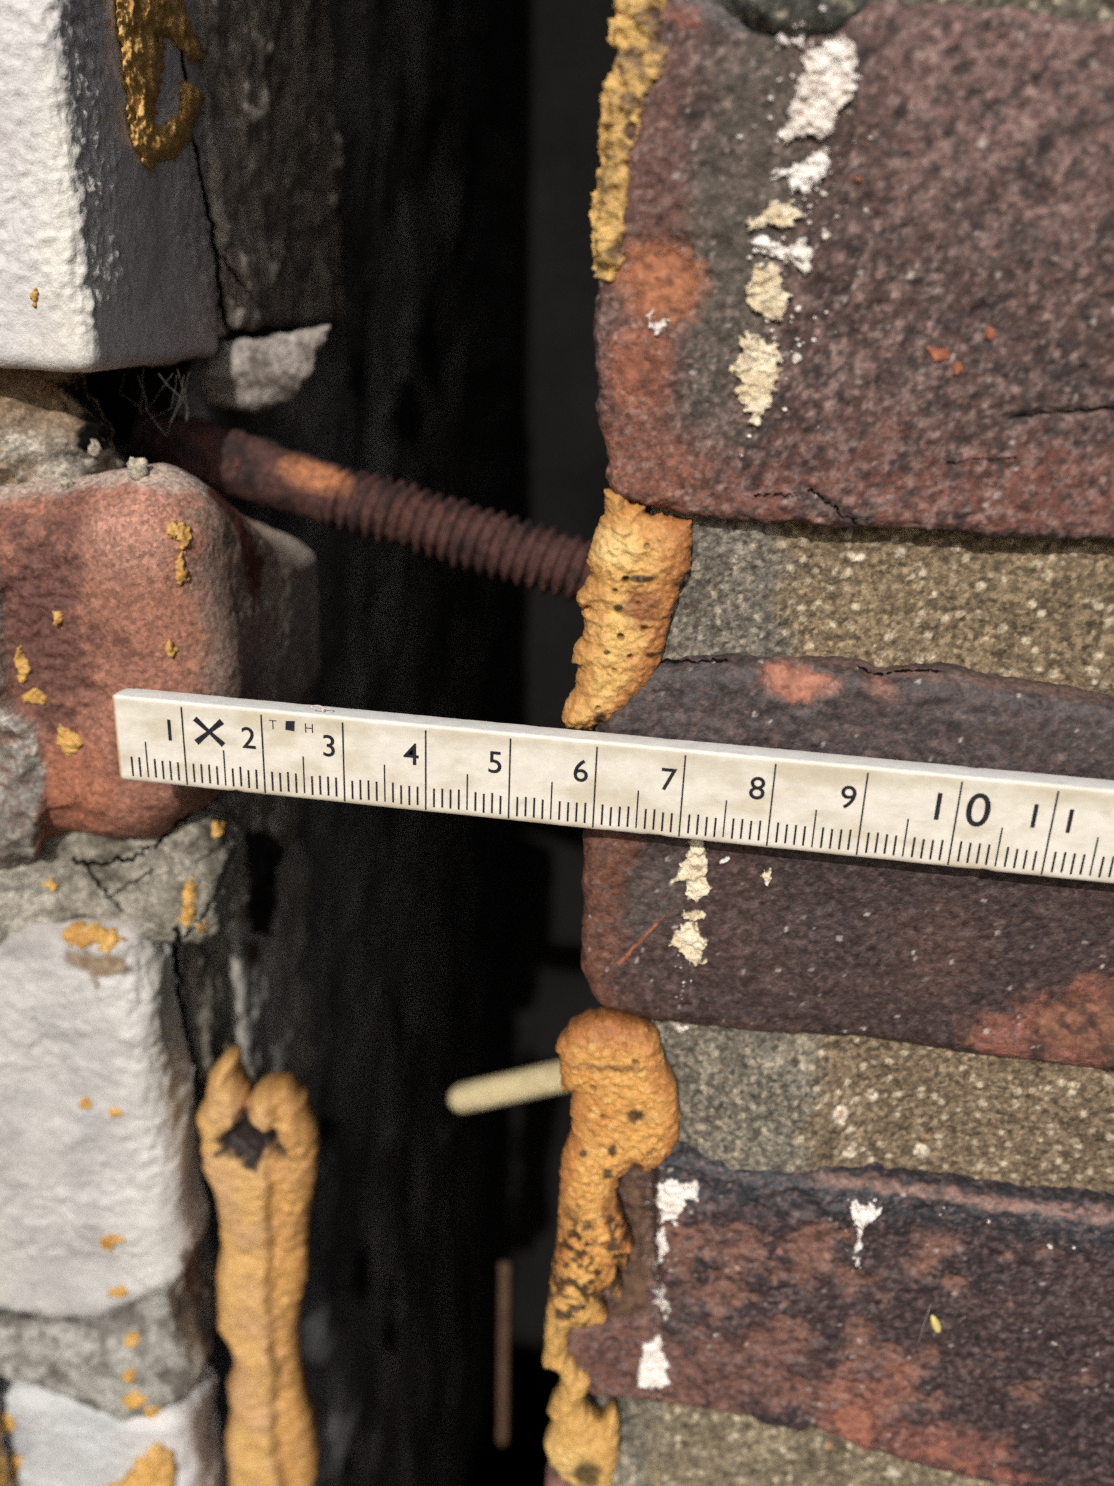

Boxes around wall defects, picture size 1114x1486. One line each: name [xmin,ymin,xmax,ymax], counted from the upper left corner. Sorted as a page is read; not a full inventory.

crack [179,50,187,82]
crack [192,132,320,335]
corrosion [207,487,264,612]
crack [71,812,192,912]
crack [171,904,209,1105]